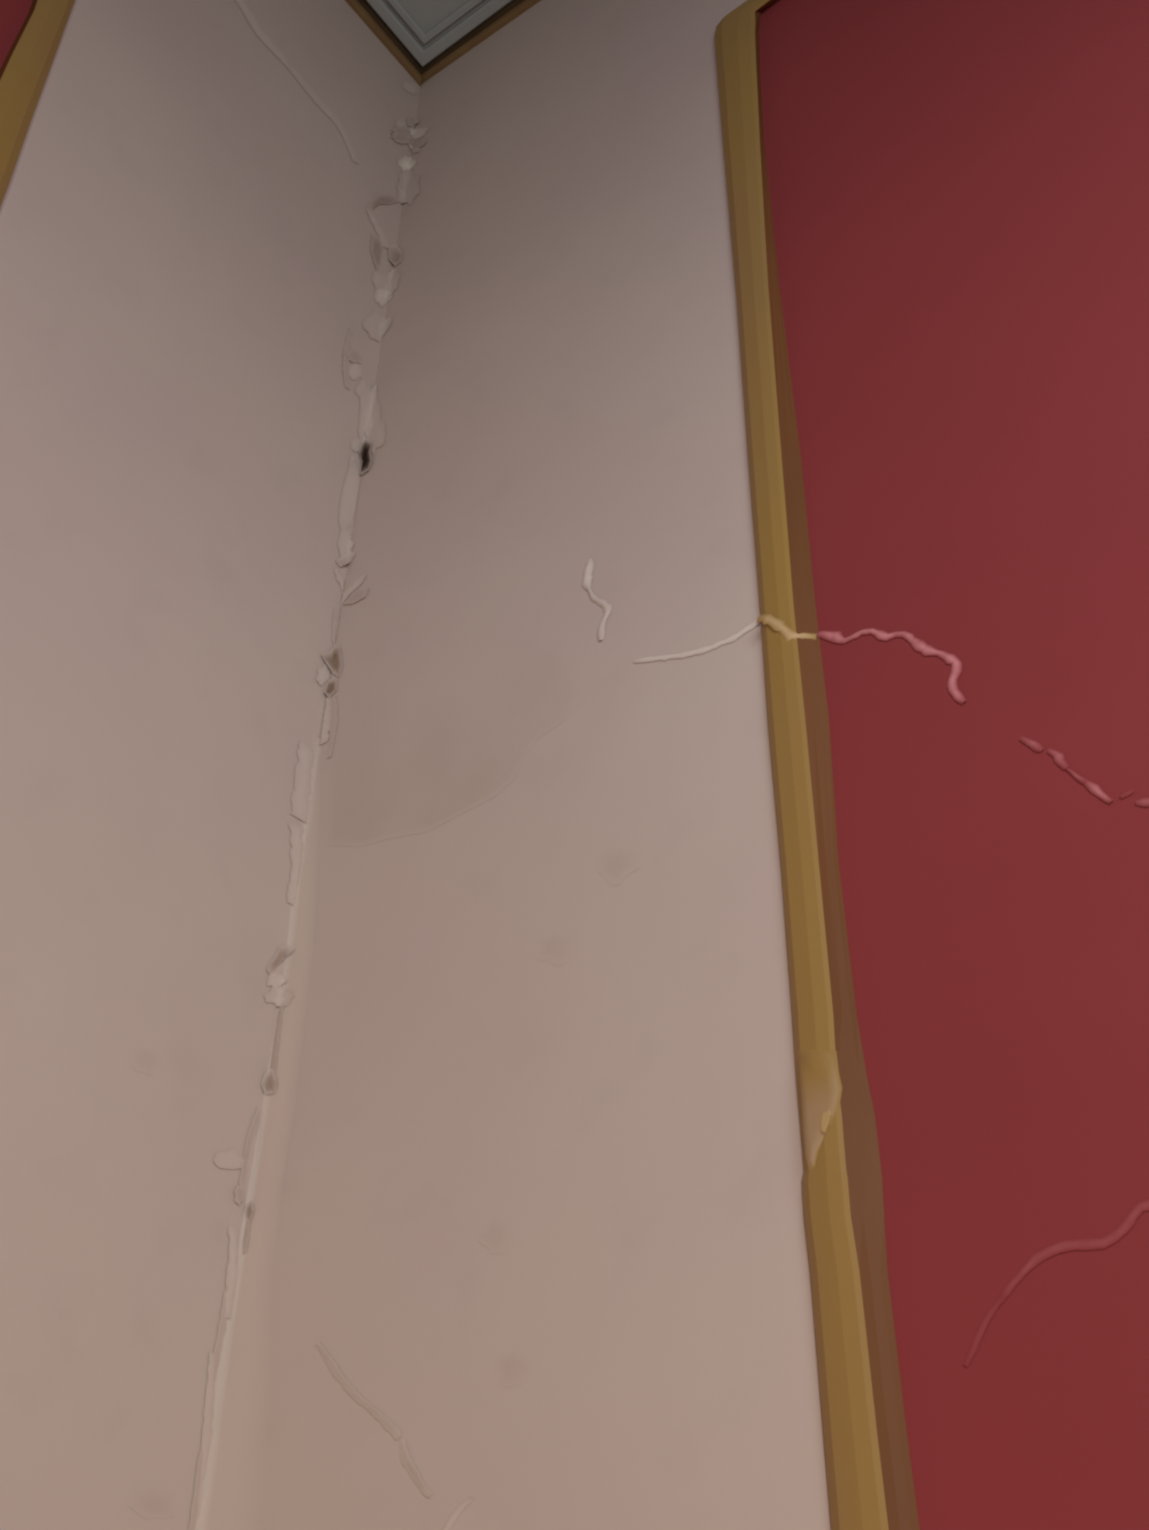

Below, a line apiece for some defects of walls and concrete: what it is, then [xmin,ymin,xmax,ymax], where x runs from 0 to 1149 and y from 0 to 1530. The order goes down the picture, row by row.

crack [287,81,430,905]
crack [582,559,612,641]
crack [633,614,967,705]
crack [1019,736,1149,807]
peeling [799,1049,842,1173]
crack [189,945,295,1530]
crack [963,1199,1149,1367]